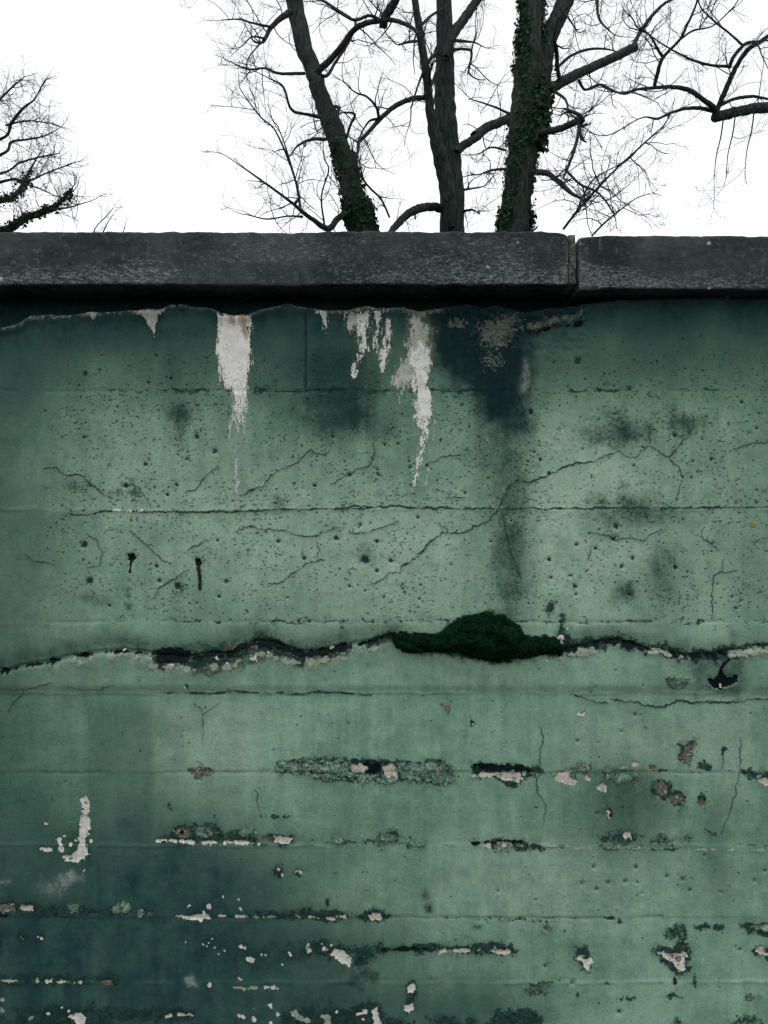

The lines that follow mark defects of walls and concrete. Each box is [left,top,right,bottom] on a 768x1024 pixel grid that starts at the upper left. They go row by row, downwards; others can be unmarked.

damp [1,304,579,498]
crack [45,416,768,619]
spalling [700,659,740,694]
crack [574,694,768,708]
spalling [274,756,456,788]
spalling [471,759,706,806]
peeling [39,796,93,887]
spalling [156,822,294,849]
spalling [471,809,766,853]
spalling [175,899,391,923]
spalling [281,938,519,967]
peeling [651,922,692,978]